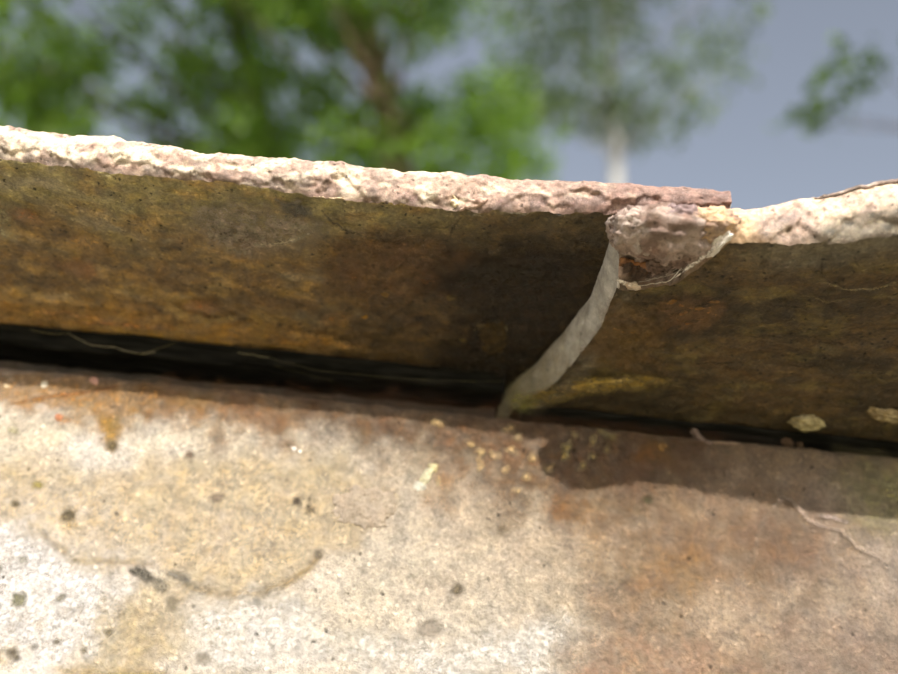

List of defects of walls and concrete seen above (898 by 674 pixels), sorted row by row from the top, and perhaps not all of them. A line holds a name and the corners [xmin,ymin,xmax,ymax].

spalling [0,126,898,291]
leakage [424,243,597,381]
leakage [354,415,705,518]